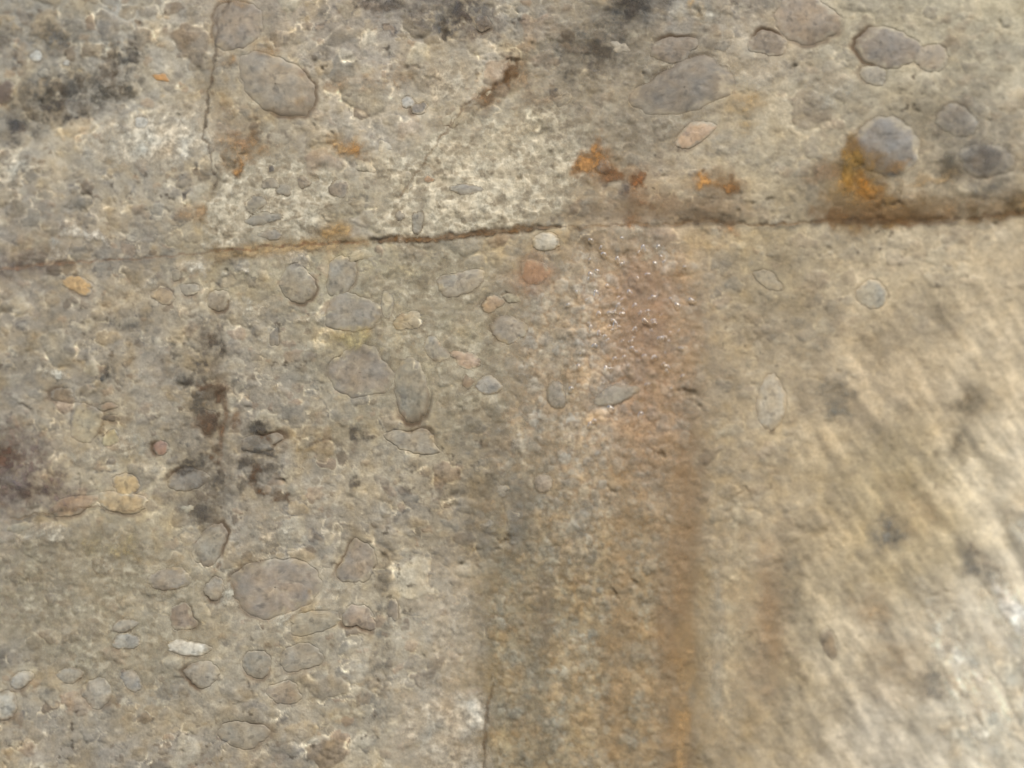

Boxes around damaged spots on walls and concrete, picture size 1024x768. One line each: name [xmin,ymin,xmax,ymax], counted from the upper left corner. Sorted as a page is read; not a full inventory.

corrosion [576,144,646,227]
crack [348,212,1021,243]
corrosion [815,143,930,228]
water stain [178,326,290,523]